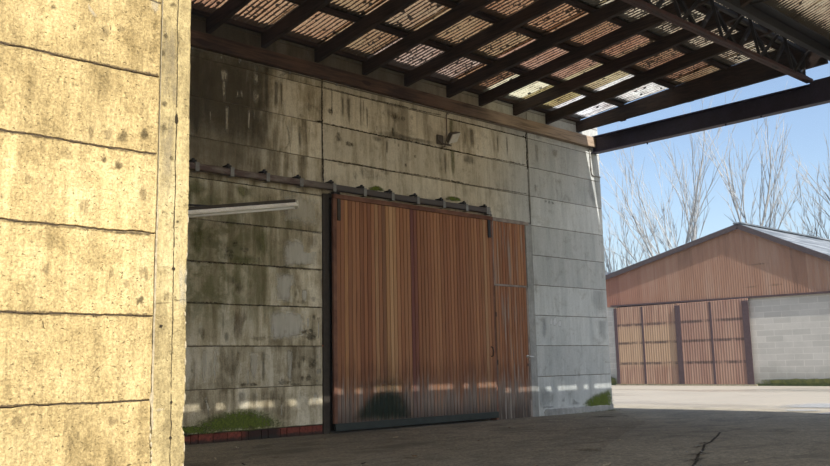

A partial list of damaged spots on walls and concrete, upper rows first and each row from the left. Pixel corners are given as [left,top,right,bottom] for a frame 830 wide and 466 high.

damp [326,123,525,165]
damp [325,159,526,194]